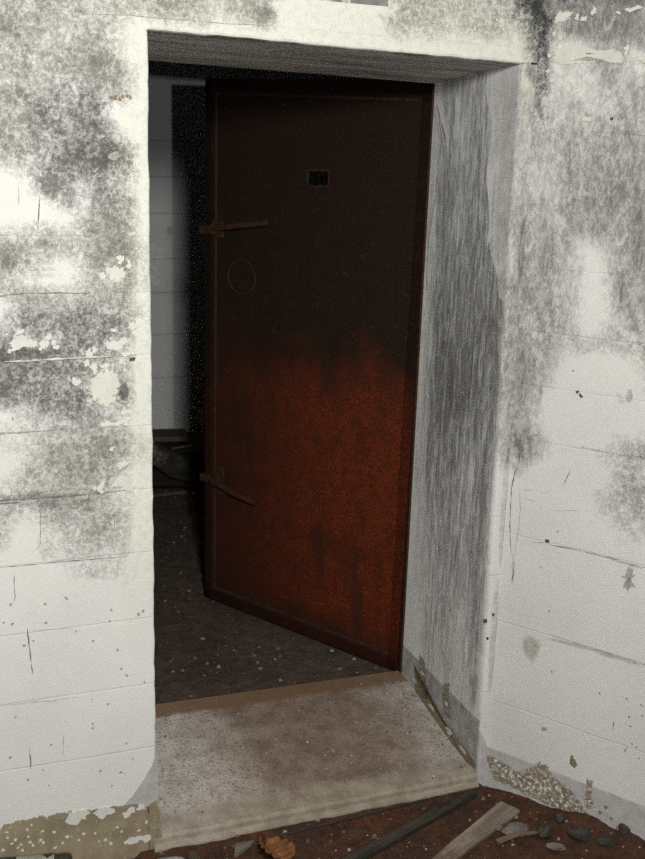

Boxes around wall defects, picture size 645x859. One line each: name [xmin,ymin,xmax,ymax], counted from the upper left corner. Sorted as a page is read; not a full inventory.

damp [490,0,645,118]
peeling [545,6,629,84]
damp [0,0,134,537]
damp [426,90,645,643]
peeling [411,655,477,767]
peeling [0,752,162,859]
peeling [487,756,619,830]